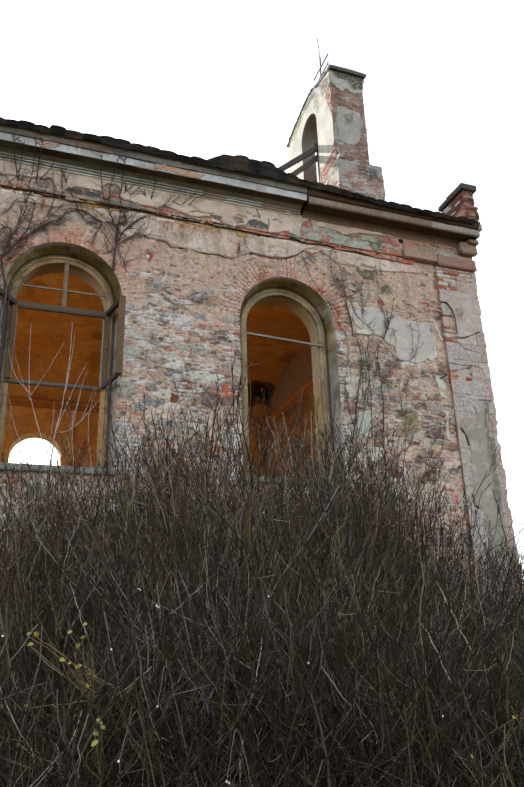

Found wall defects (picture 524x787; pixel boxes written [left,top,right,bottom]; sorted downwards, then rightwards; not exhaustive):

flaking render [320,69,364,185]
spalling [154,164,205,179]
spalling [0,172,458,264]
crack [243,236,307,275]
spalling [357,268,376,280]
flaking render [348,270,481,365]
spalling [208,380,275,407]
spalling [435,366,472,399]
flaking render [356,407,373,438]